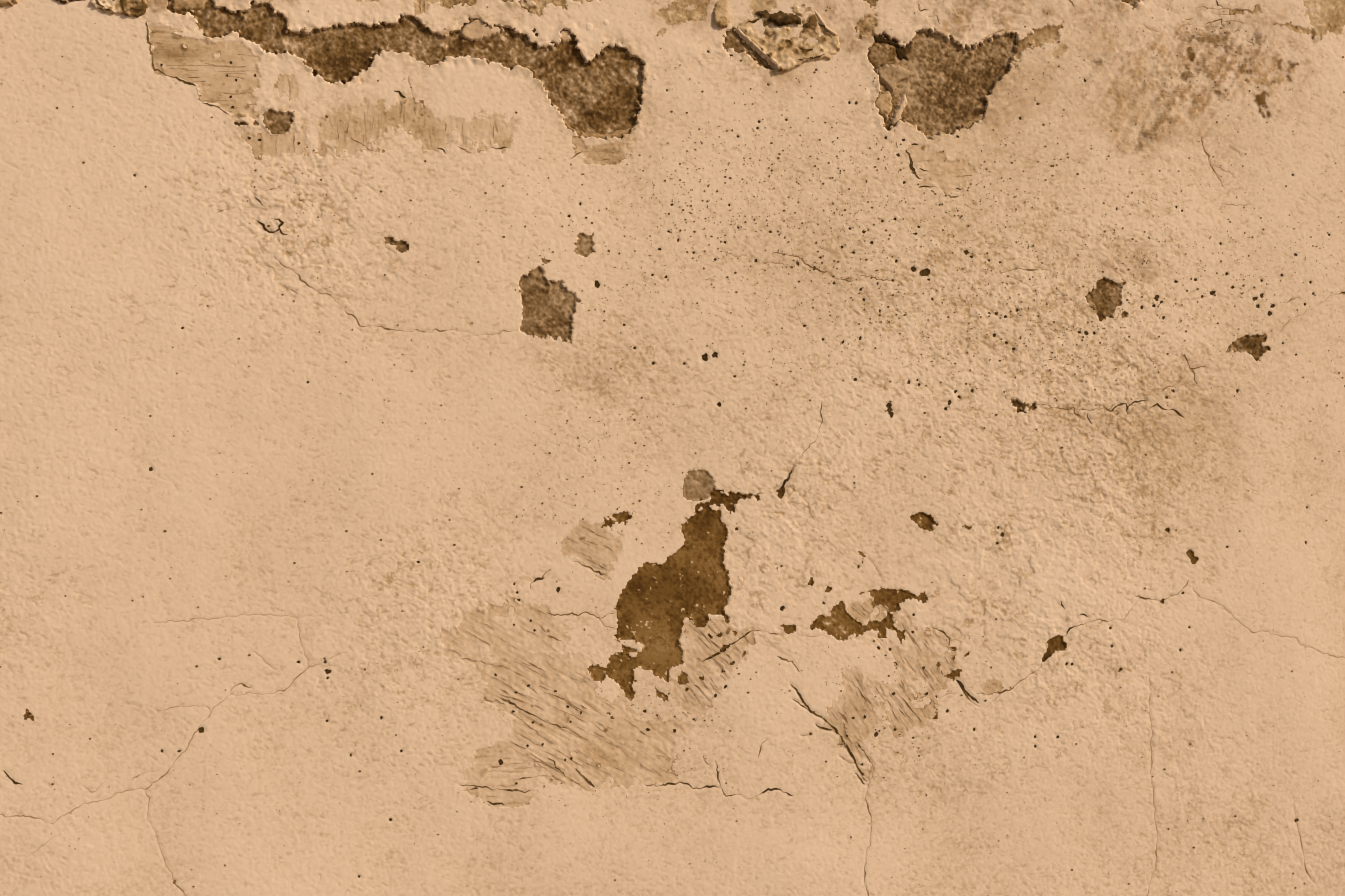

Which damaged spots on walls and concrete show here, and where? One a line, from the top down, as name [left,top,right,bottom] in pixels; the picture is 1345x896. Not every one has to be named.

spalling [89,0,645,168]
peeling [654,0,712,37]
peeling [707,0,840,86]
spalling [854,0,1068,196]
spalling [519,258,581,344]
spalling [1078,278,1165,335]
spalling [1226,333,1297,361]
peeling [440,469,761,808]
peeling [780,577,1003,784]
crack [940,664,1044,714]
crack [1061,582,1345,658]
crack [0,613,346,896]